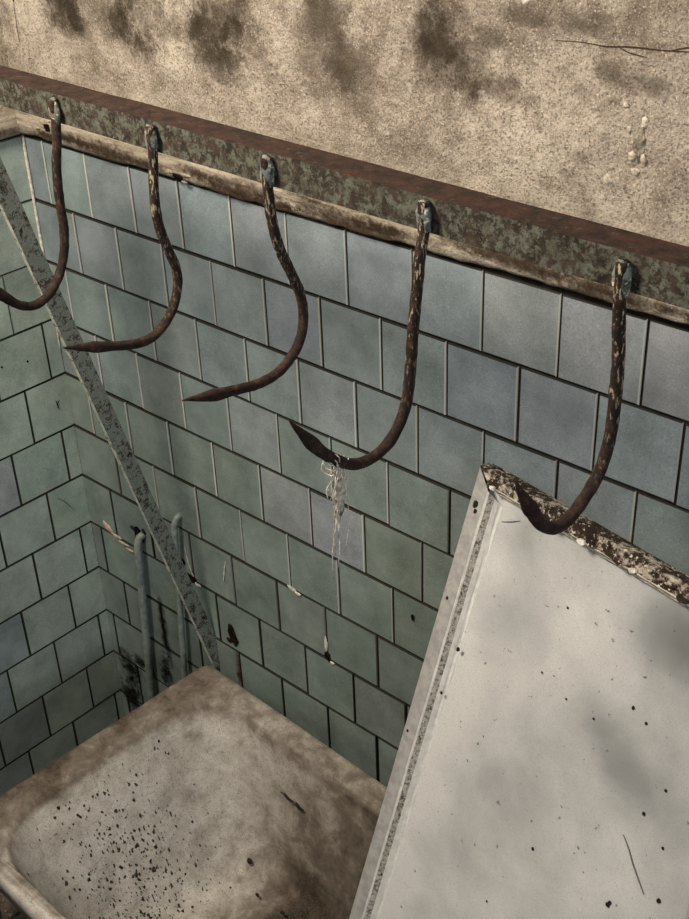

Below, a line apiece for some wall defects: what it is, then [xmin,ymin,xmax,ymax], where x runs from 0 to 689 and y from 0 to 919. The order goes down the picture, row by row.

water stain [191,0,246,71]
water stain [418,12,476,99]
crack [555,40,689,58]